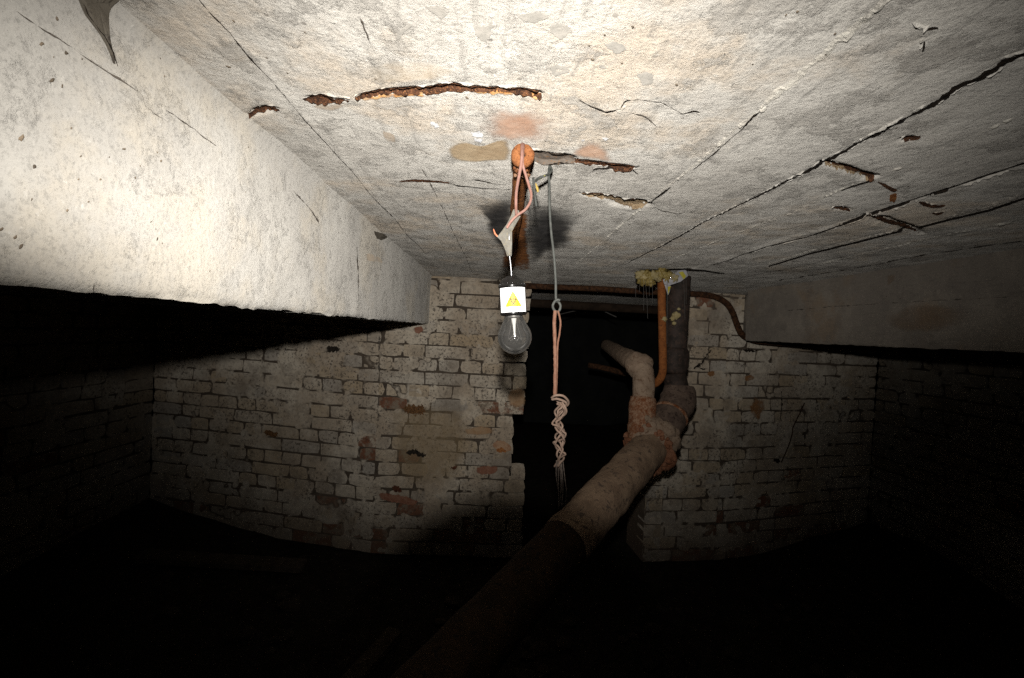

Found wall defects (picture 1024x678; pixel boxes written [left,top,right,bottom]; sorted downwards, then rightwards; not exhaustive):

peeling [79,0,119,65]
crack [17,11,216,146]
spalling [248,105,280,119]
crack [200,1,542,248]
rust [498,114,541,138]
crack [580,99,700,127]
damp [450,141,509,161]
spalling [532,148,638,174]
crack [628,49,1024,281]
spalling [581,192,684,214]
crack [399,169,510,273]